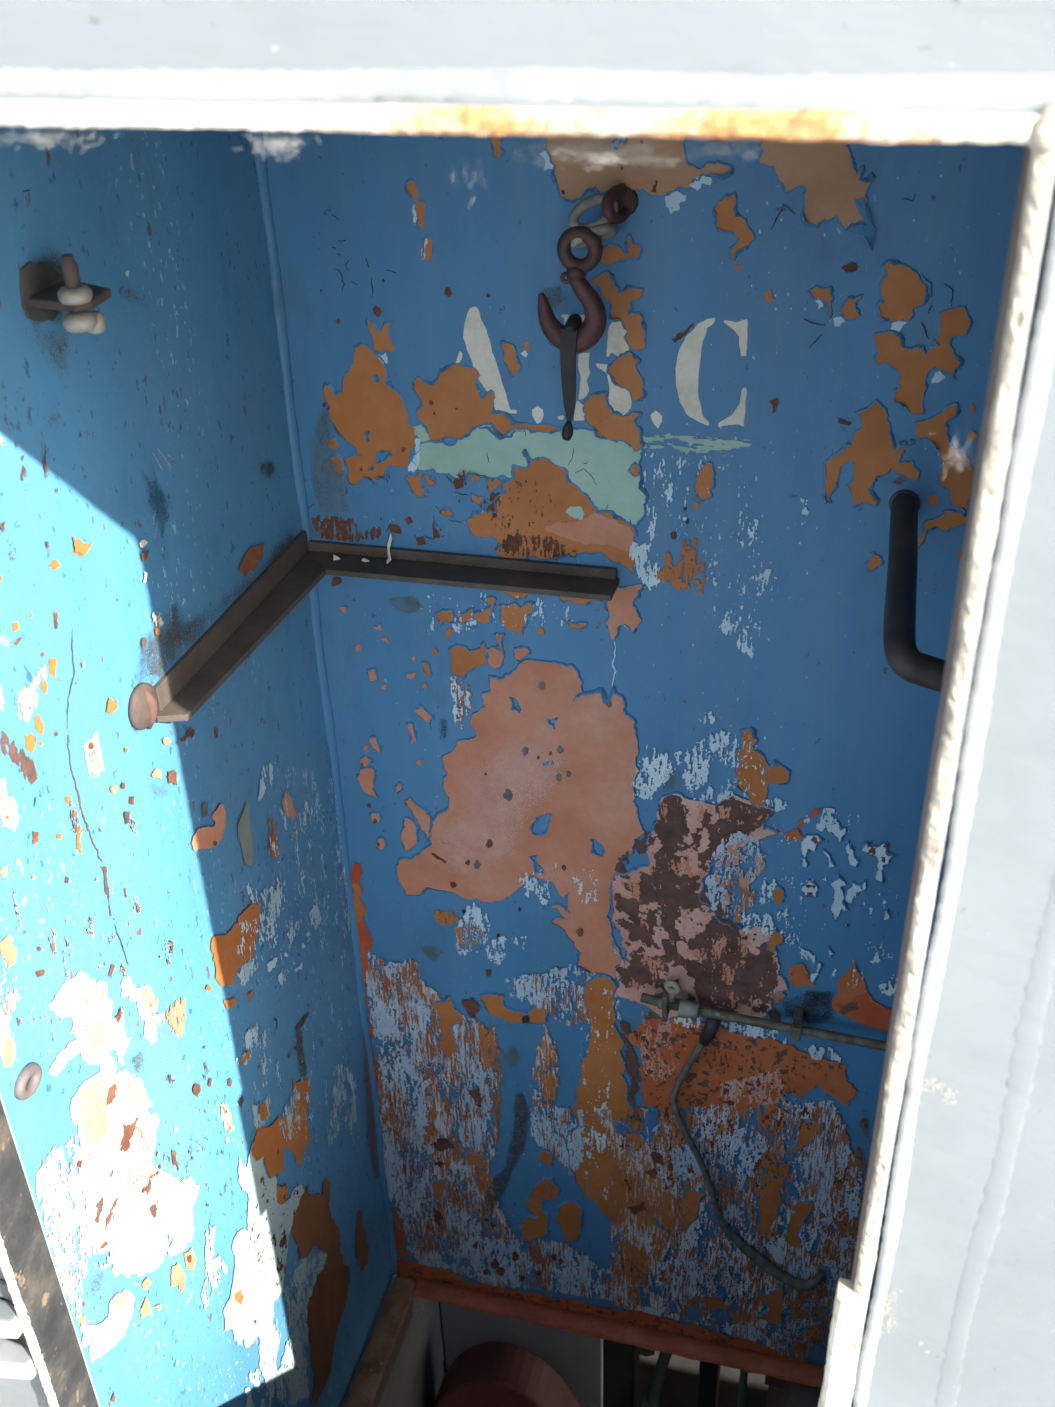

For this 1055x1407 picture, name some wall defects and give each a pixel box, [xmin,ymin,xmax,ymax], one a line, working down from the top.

peeling [539,136,755,275]
peeling [758,140,977,551]
peeling [0,233,897,1407]
corrosion [613,795,867,1215]